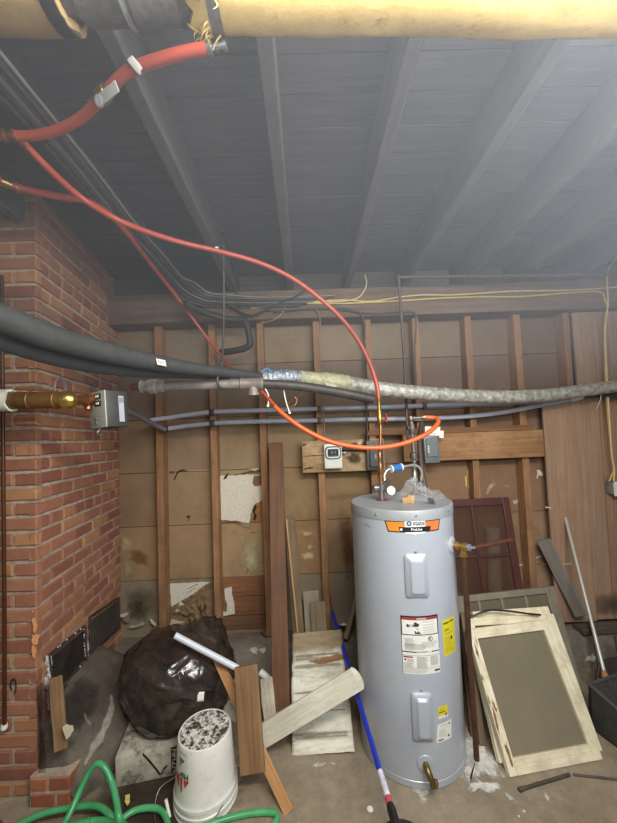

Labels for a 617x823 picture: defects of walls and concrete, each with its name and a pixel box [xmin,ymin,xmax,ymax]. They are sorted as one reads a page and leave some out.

peeling [220,468,263,527]
peeling [170,582,210,607]
spalling [31,610,40,658]
leakage [459,733,518,804]